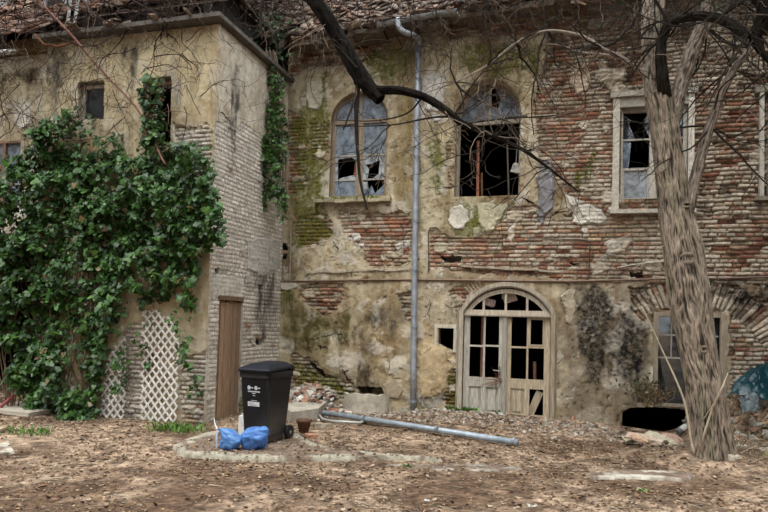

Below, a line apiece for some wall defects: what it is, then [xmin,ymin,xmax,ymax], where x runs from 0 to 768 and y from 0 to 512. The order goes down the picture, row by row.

flaking render [666,21,695,88]
flaking render [429,9,670,325]
flaking render [685,13,768,382]
flaking render [174,78,344,424]
flaking render [293,207,412,268]
damp [286,294,349,351]
flaking render [398,290,411,323]
flaking render [291,352,384,400]